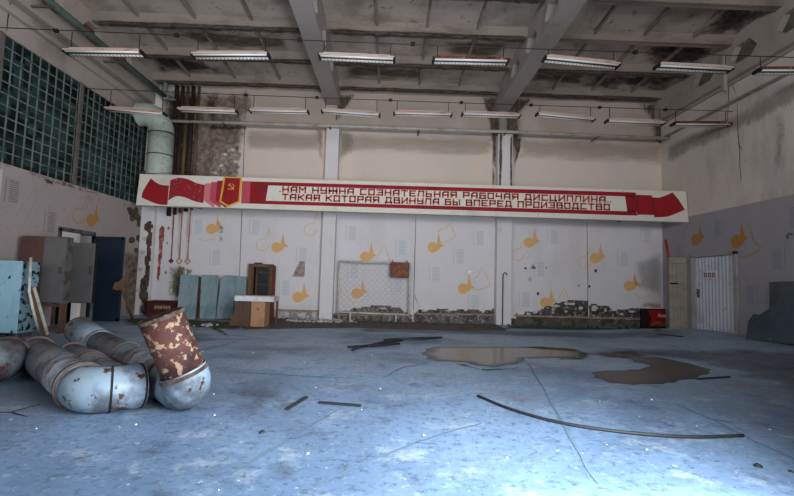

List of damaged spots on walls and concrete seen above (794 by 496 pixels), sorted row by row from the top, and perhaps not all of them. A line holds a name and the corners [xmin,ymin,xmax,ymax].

mould [711,10,757,32]
leakage [135,54,320,176]
leakage [335,46,708,186]
crack [727,87,742,179]
flaking render [124,204,170,302]
flaking render [511,300,640,328]
crack [528,364,599,484]